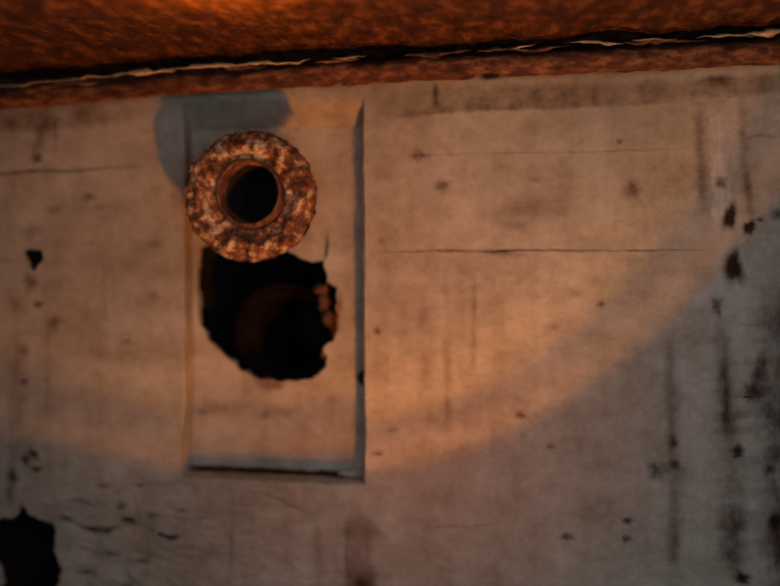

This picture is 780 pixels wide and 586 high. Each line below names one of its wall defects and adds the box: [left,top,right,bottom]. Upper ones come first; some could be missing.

spalling [23,248,44,272]
spalling [0,504,62,586]